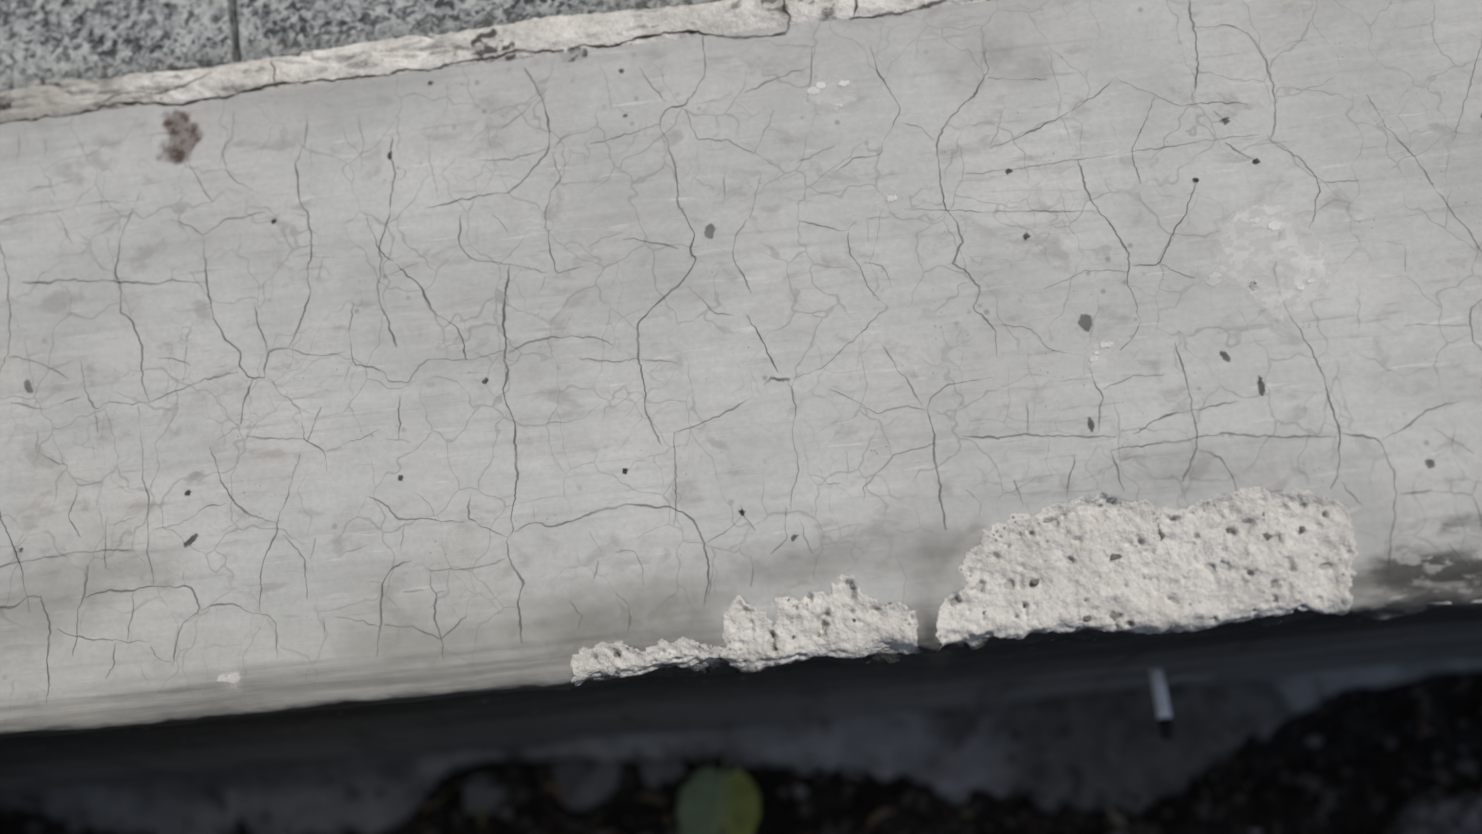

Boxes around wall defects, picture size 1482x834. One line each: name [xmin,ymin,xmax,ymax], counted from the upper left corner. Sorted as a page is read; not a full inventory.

crack [852,0,942,19]
crack [0,0,791,124]
corrosion [164,113,200,160]
crack [501,281,509,337]
spalling [570,485,1482,690]